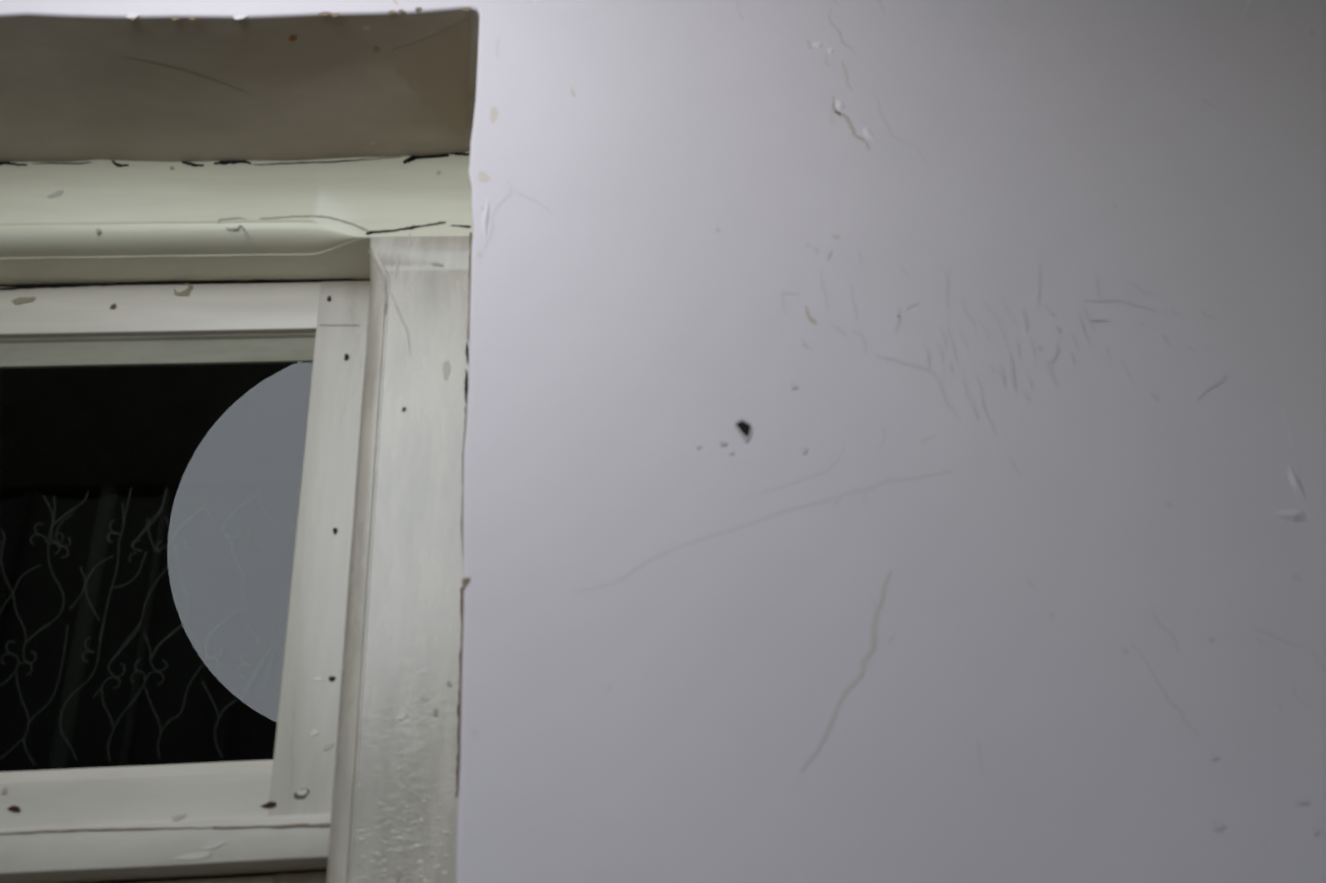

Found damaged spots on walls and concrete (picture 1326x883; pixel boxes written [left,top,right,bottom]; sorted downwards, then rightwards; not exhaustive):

crack [806,8,870,150]
crack [800,571,893,773]